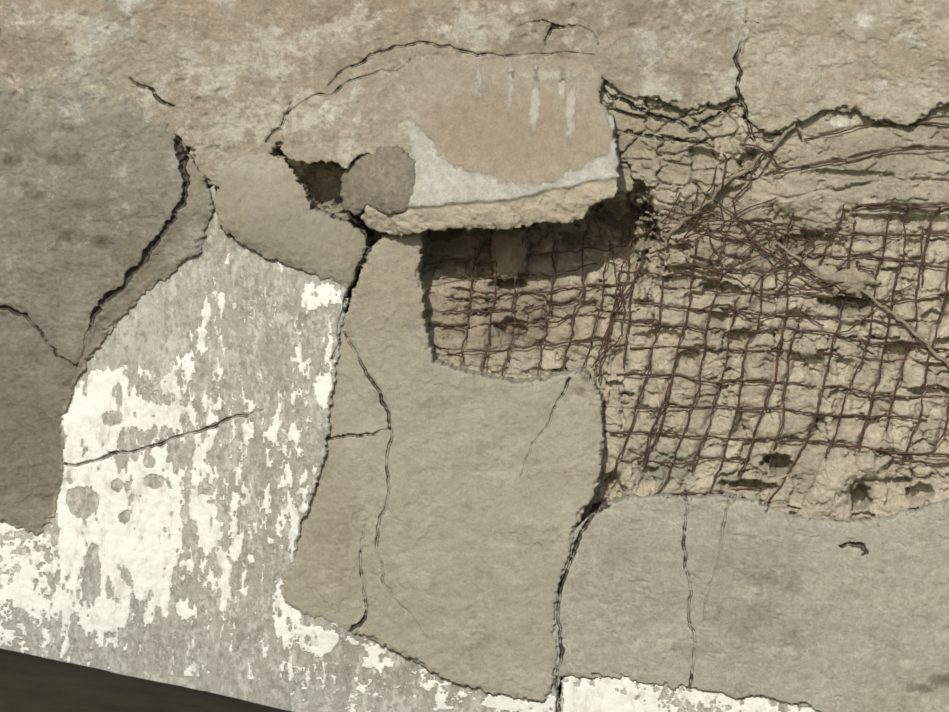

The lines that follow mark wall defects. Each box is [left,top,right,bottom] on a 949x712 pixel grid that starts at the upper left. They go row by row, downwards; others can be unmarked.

crack [130,79,175,106]
crack [603,16,757,148]
crack [0,138,190,367]
crack [64,409,262,466]
crack [326,211,409,632]
peeling [40,570,61,600]
peeling [77,543,101,609]
crack [555,499,610,712]
peeling [292,620,339,661]
peeling [361,642,394,677]
peeling [481,677,562,712]
peeling [560,673,820,712]